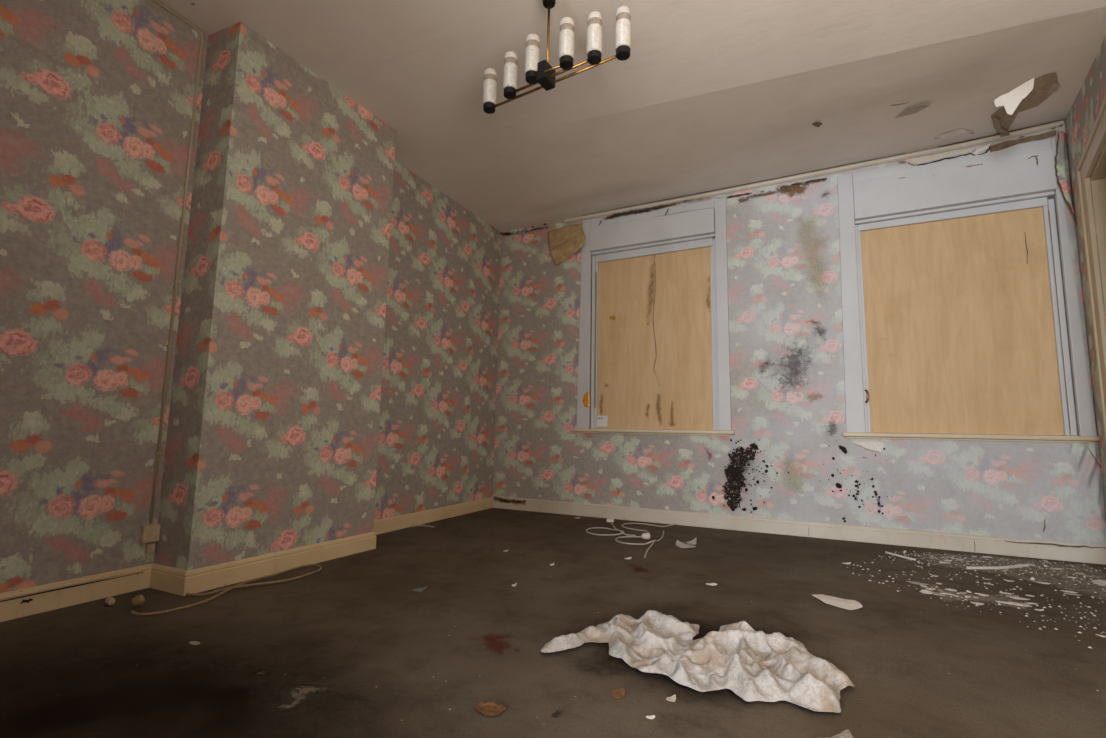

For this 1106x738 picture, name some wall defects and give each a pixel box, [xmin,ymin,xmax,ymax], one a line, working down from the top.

peeling [990,72,1063,152]
water stain [781,350,810,385]
water stain [712,439,789,513]